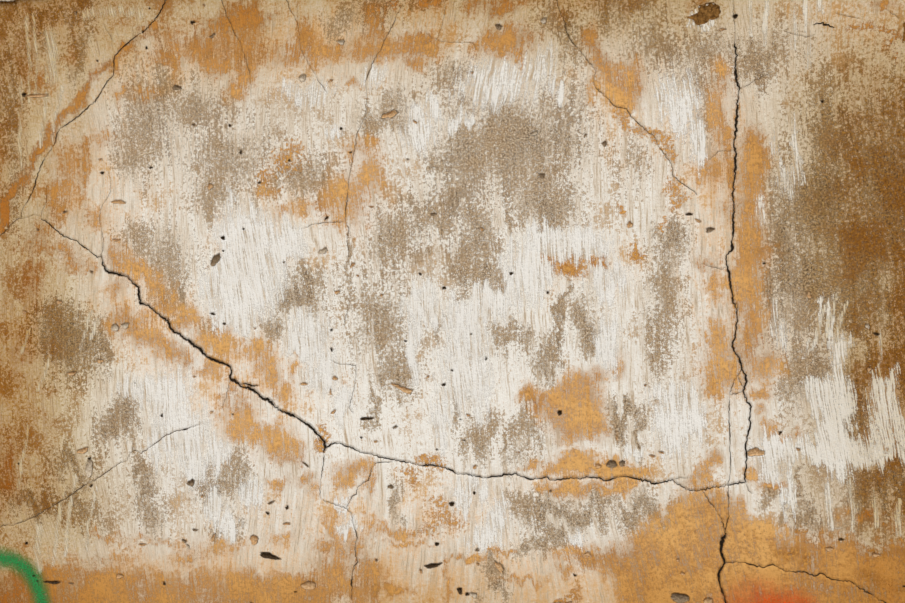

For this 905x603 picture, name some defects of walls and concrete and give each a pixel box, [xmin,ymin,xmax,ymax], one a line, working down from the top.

crack [14,0,166,222]
crack [557,2,697,195]
peeling [106,54,356,430]
crack [41,43,752,599]
flaking render [318,0,905,603]
crack [1,426,195,527]
crack [717,507,875,603]